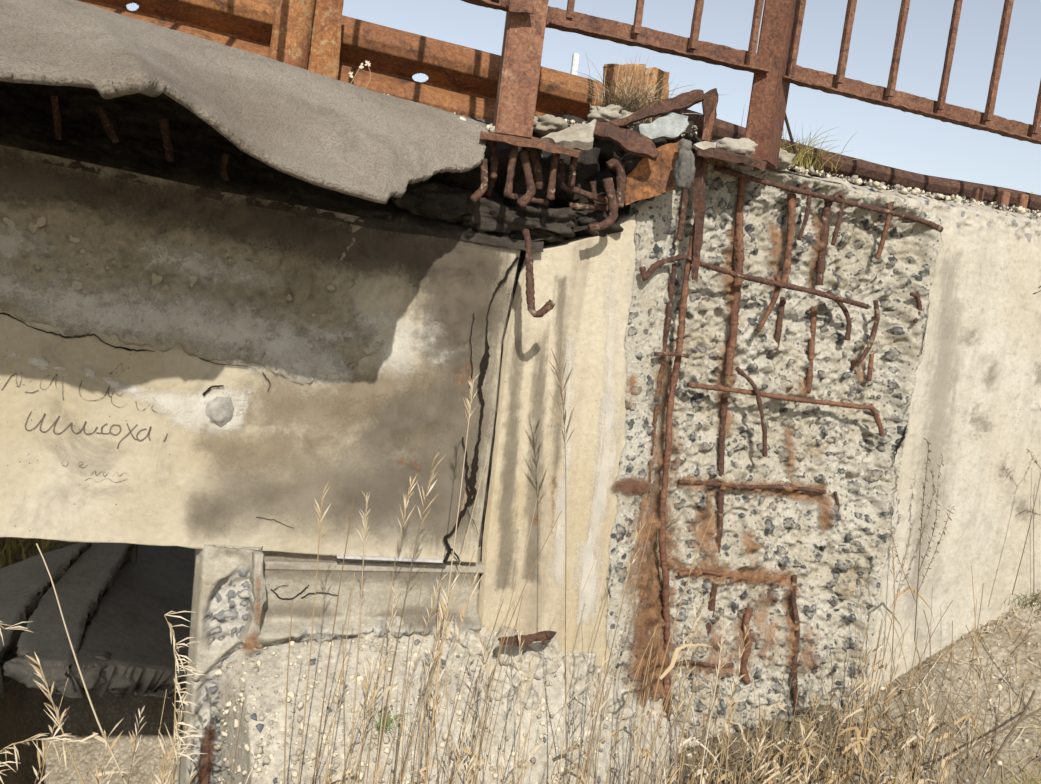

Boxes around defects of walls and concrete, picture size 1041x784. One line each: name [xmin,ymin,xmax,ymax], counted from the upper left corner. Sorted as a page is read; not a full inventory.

corrosion [694,152,739,168]
peeling [0,81,560,386]
corrosion [723,227,735,320]
corrosion [768,222,787,291]
crack [0,312,155,352]
crack [200,358,271,396]
water stain [0,153,510,541]
crack [443,256,519,565]
spalling [470,120,943,753]
corrosion [612,342,834,718]
spalling [2,650,137,690]